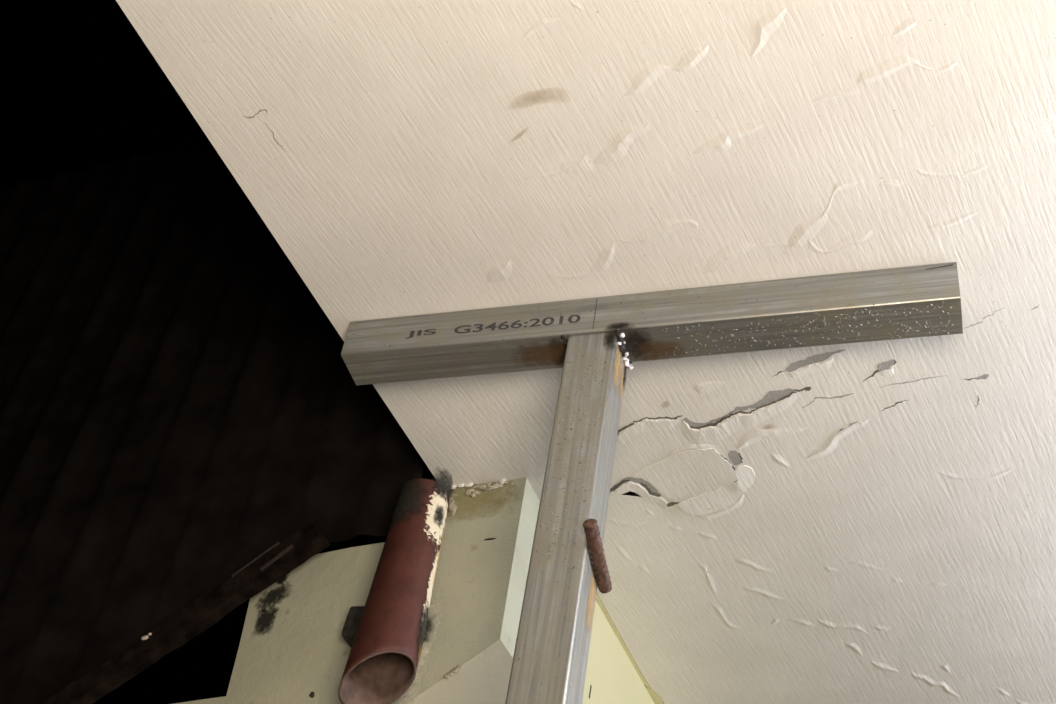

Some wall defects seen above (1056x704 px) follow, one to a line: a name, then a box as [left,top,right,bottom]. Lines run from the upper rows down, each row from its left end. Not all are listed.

peeling [774,349,845,380]
peeling [863,359,897,382]
peeling [609,444,755,521]